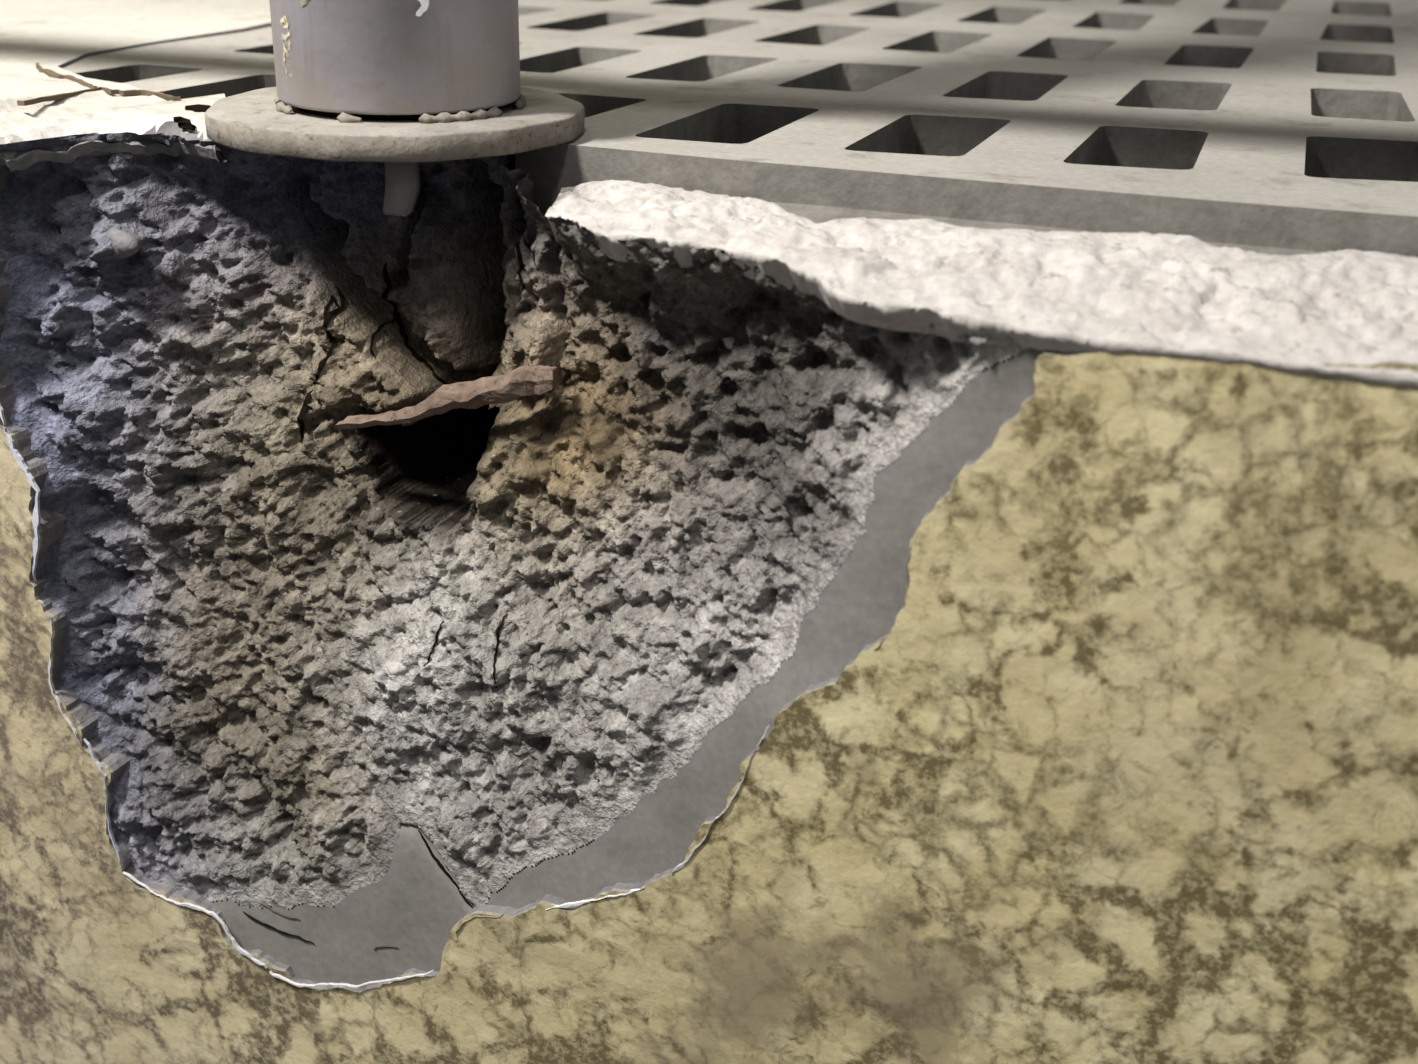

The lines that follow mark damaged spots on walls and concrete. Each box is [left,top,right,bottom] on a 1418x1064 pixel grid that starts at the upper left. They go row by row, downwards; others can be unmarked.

crack [297,263,451,443]
rust [333,365,566,430]
spalling [0,132,1058,989]